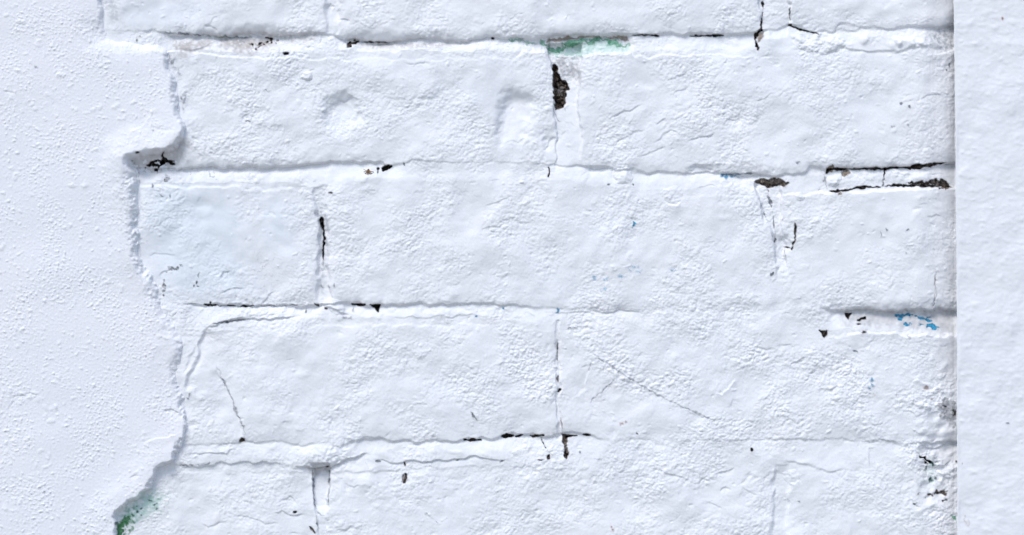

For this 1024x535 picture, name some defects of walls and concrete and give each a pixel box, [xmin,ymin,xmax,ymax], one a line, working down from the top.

crack [754,2,764,50]
spalling [547,36,627,110]
spalling [147,152,175,171]
crack [823,163,950,193]
crack [720,171,797,250]
crack [318,217,326,259]
crack [204,302,254,324]
peeling [895,313,939,330]
crack [530,422,581,457]